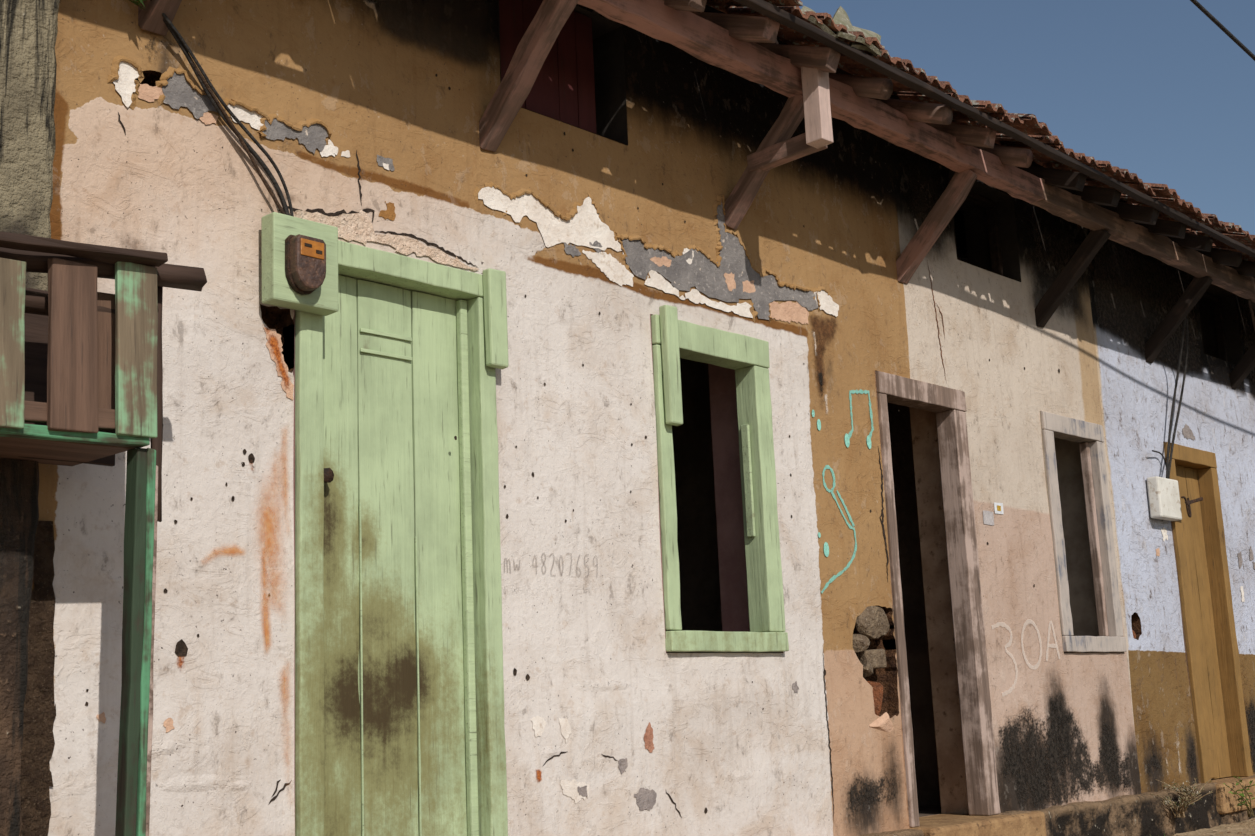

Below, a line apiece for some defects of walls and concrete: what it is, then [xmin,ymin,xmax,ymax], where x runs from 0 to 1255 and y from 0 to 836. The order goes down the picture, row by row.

peeling [107,55,350,157]
peeling [377,155,395,171]
flaking render [293,201,479,271]
peeling [473,182,839,324]
spalling [263,327,294,400]
leakage [811,317,836,412]
rust [263,507,277,646]
spalling [853,606,894,733]
leakage [848,770,896,814]
leakage [999,695,1134,810]
leakage [1246,699,1255,772]